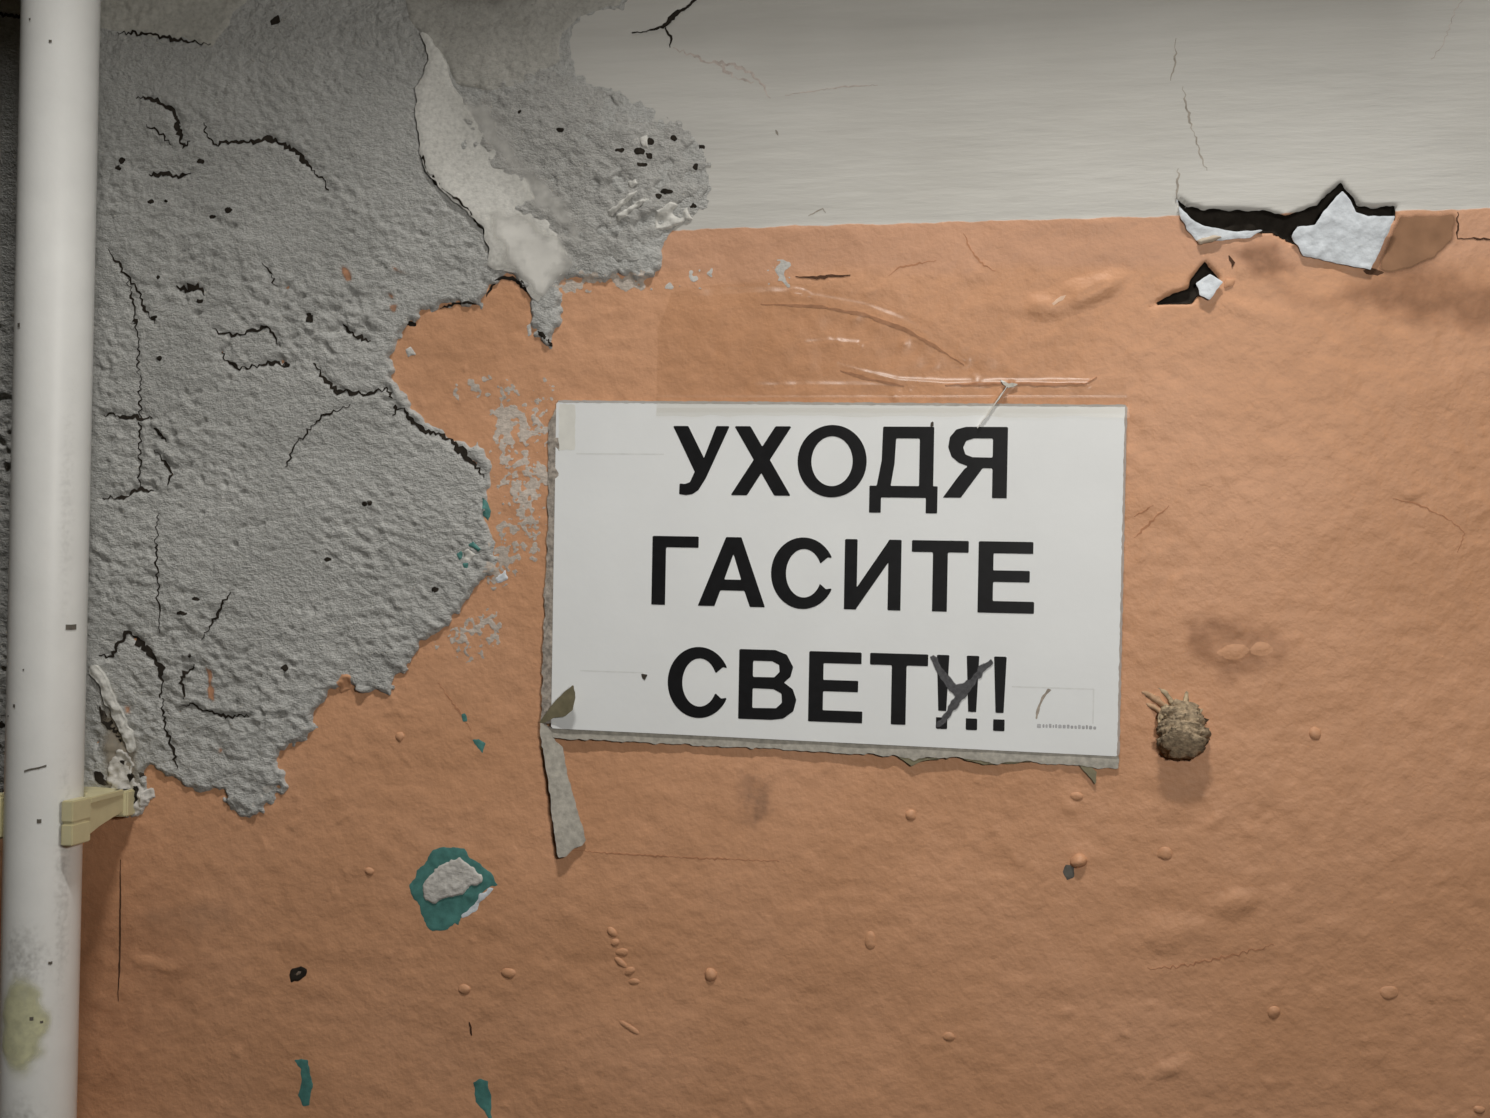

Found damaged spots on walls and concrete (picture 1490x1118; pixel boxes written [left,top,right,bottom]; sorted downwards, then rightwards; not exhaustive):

crack [0,11,20,19]
crack [136,96,329,191]
peeling [767,259,850,288]
peeling [1157,183,1455,305]
crack [1456,212,1490,240]
spalling [0,0,21,793]
crack [214,313,484,478]
spalling [84,0,713,818]
crack [99,249,249,769]
spalling [409,847,498,931]